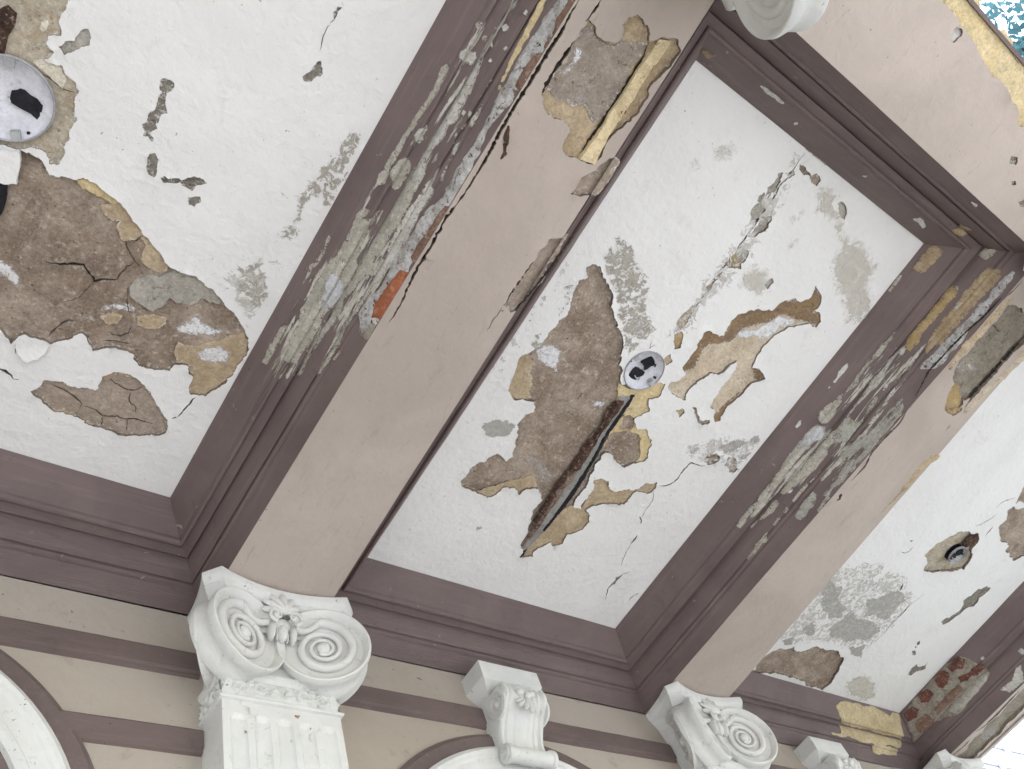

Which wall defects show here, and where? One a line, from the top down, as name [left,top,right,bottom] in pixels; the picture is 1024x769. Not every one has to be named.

spalling [541,15,679,196]
peeling [941,0,1024,126]
spalling [0,0,280,395]
spalling [261,0,574,380]
spalling [32,372,167,434]
rust [520,400,624,546]
spalling [461,148,826,556]
spalling [736,246,1024,560]
spalling [924,531,972,571]
peeling [752,563,915,688]
flaking render [831,641,990,756]